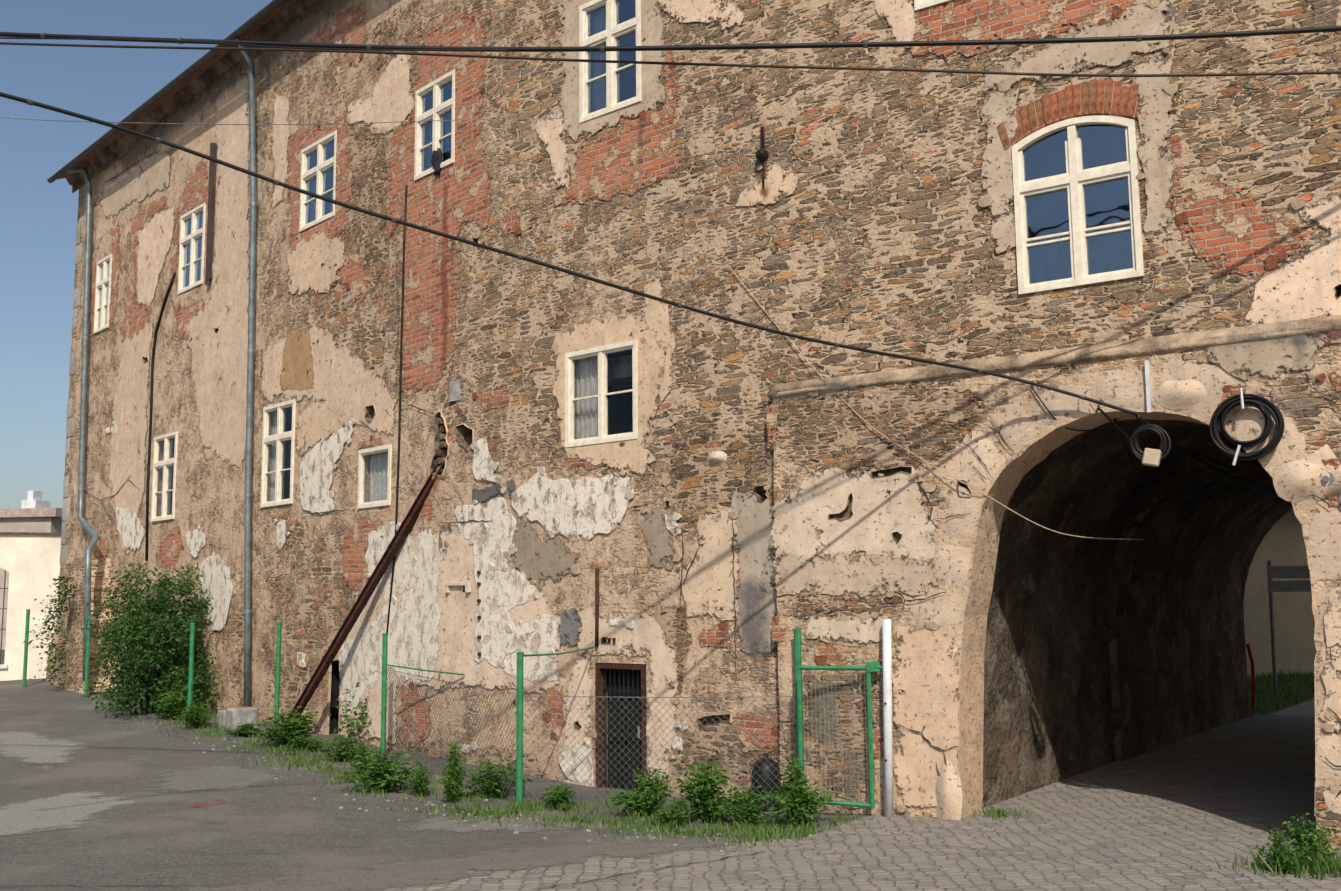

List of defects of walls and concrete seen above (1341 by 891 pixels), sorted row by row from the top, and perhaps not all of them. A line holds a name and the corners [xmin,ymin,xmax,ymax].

peeling [736,163,799,206]
spalling [875,0,1341,406]
spalling [90,0,492,558]
peeling [160,525,236,631]
peeling [337,270,984,812]
peeling [297,652,306,668]
crack [896,724,958,780]